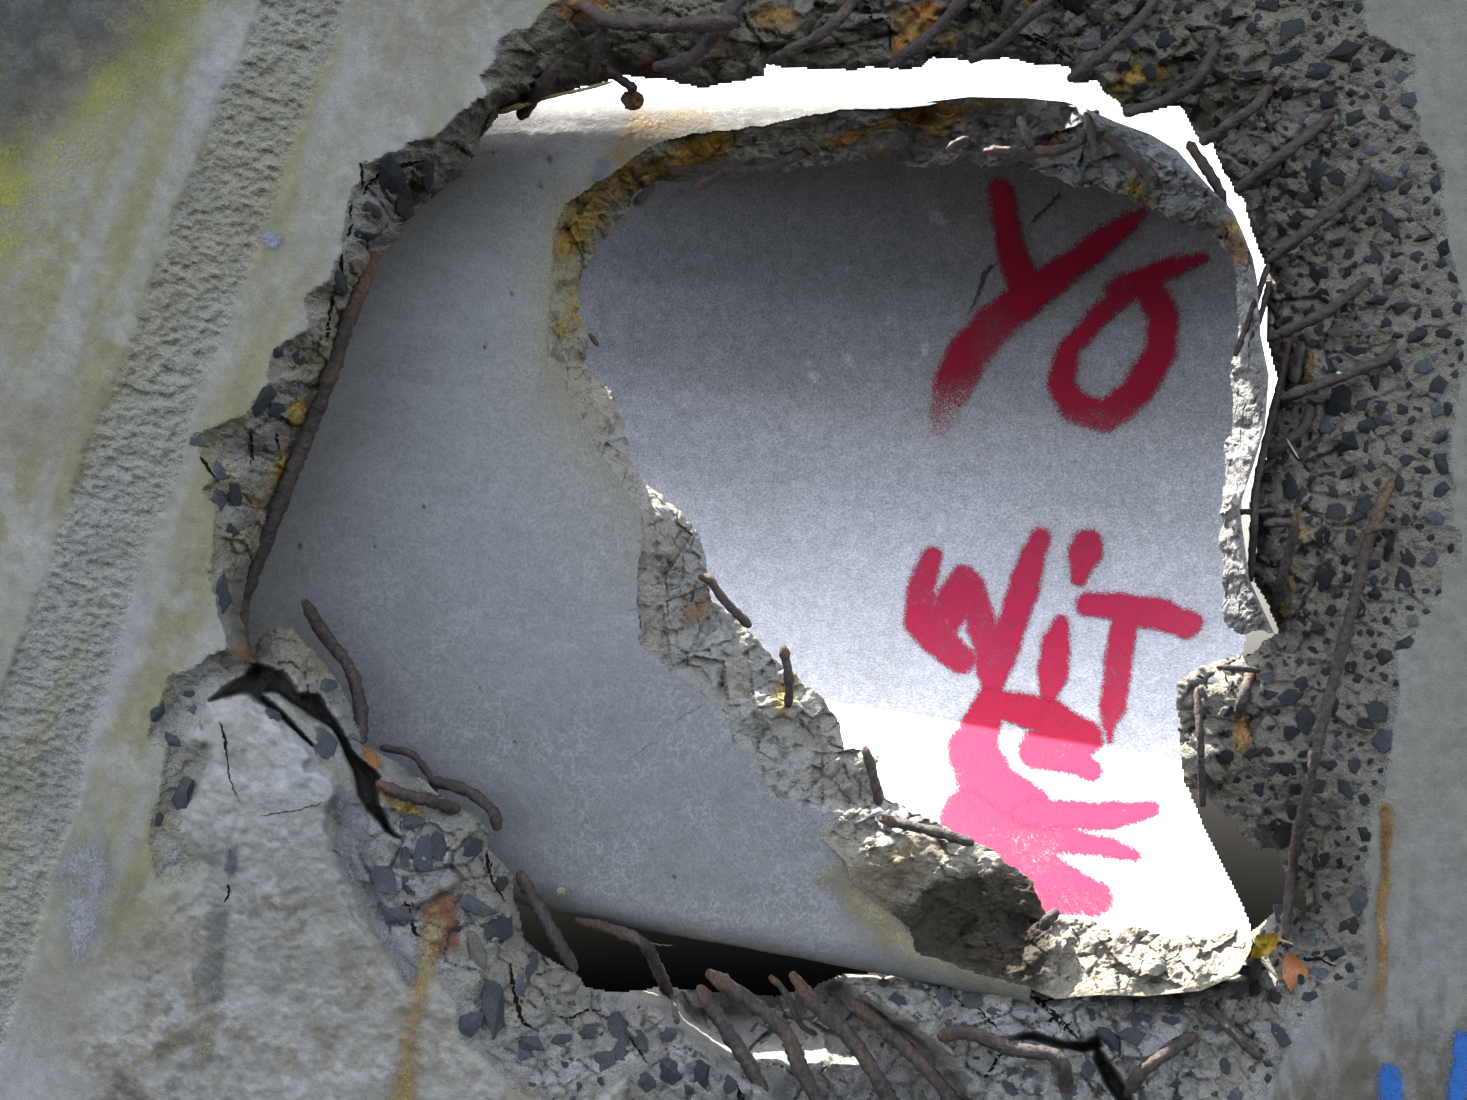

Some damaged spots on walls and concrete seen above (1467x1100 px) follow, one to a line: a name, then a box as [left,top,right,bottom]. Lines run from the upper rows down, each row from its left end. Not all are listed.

corrosion [742,0,798,28]
corrosion [892,0,962,53]
corrosion [630,51,661,76]
corrosion [1106,63,1171,101]
corrosion [820,97,1022,151]
corrosion [553,110,741,258]
corrosion [288,400,307,434]
spalling [147,0,879,1100]
spalling [767,0,1467,1100]
corrosion [1374,803,1394,1013]
corrosion [390,887,460,1100]